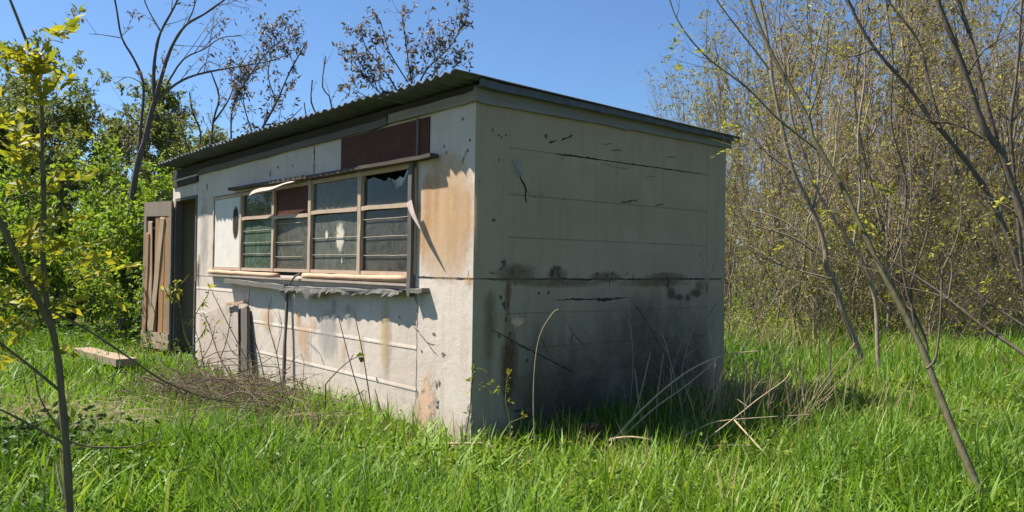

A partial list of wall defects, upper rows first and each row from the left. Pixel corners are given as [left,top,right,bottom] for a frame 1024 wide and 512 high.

crack [557,153,702,175]
corrosion [424,167,469,267]
crack [415,273,723,414]